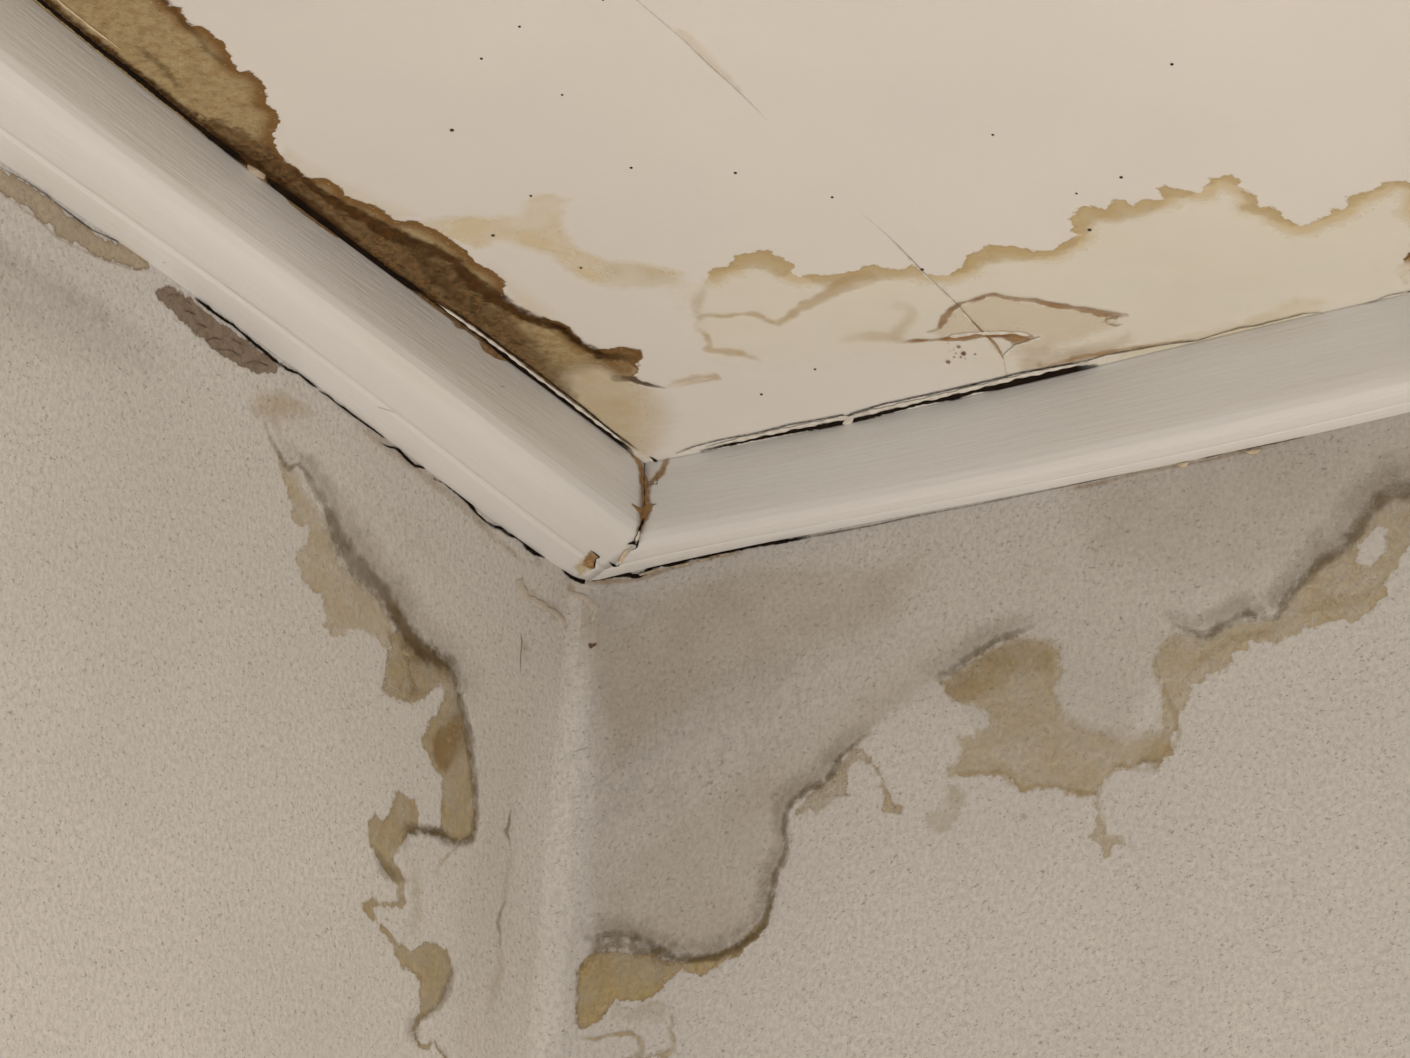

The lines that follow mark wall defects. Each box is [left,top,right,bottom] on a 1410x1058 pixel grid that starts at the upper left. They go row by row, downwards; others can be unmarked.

peeling [0,170,150,271]
water stain [710,175,1408,282]
peeling [156,286,281,374]
peeling [480,342,507,362]
crack [37,0,1307,584]
peeling [578,551,600,572]
water stain [576,858,783,1039]